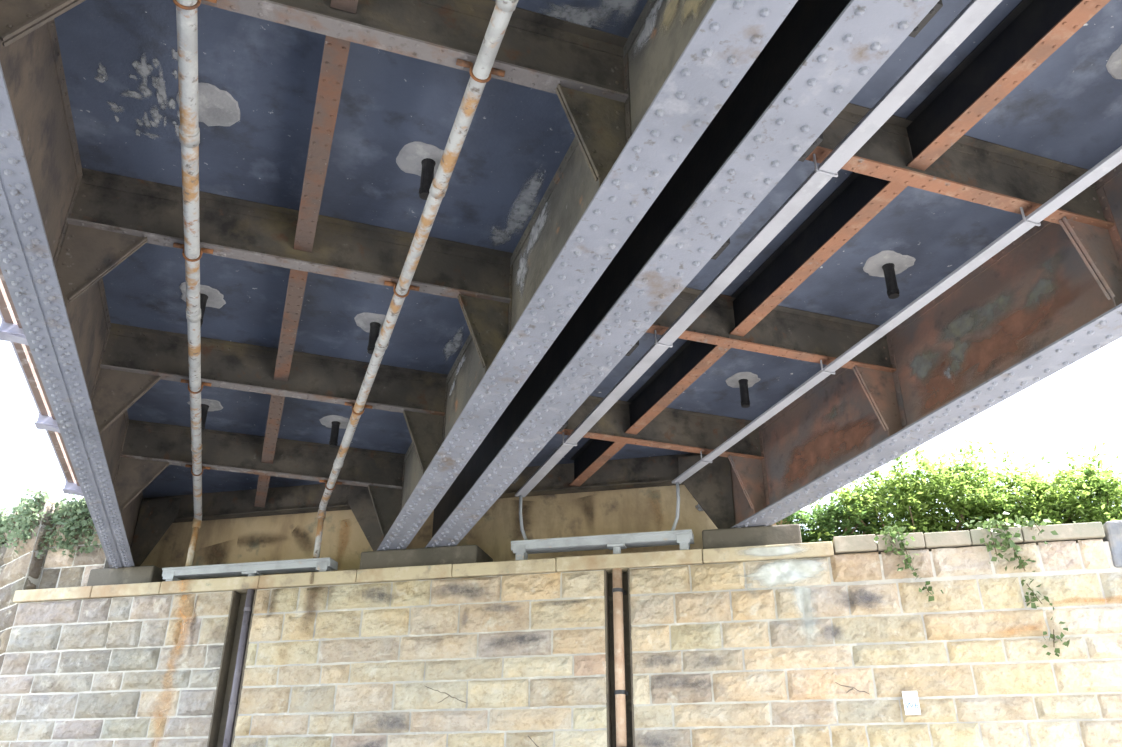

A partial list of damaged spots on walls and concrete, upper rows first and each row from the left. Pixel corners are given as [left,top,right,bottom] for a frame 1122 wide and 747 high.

peeling [546,0,636,28]
peeling [634,0,703,53]
peeling [108,49,180,138]
peeling [491,173,548,292]
peeling [444,330,465,395]